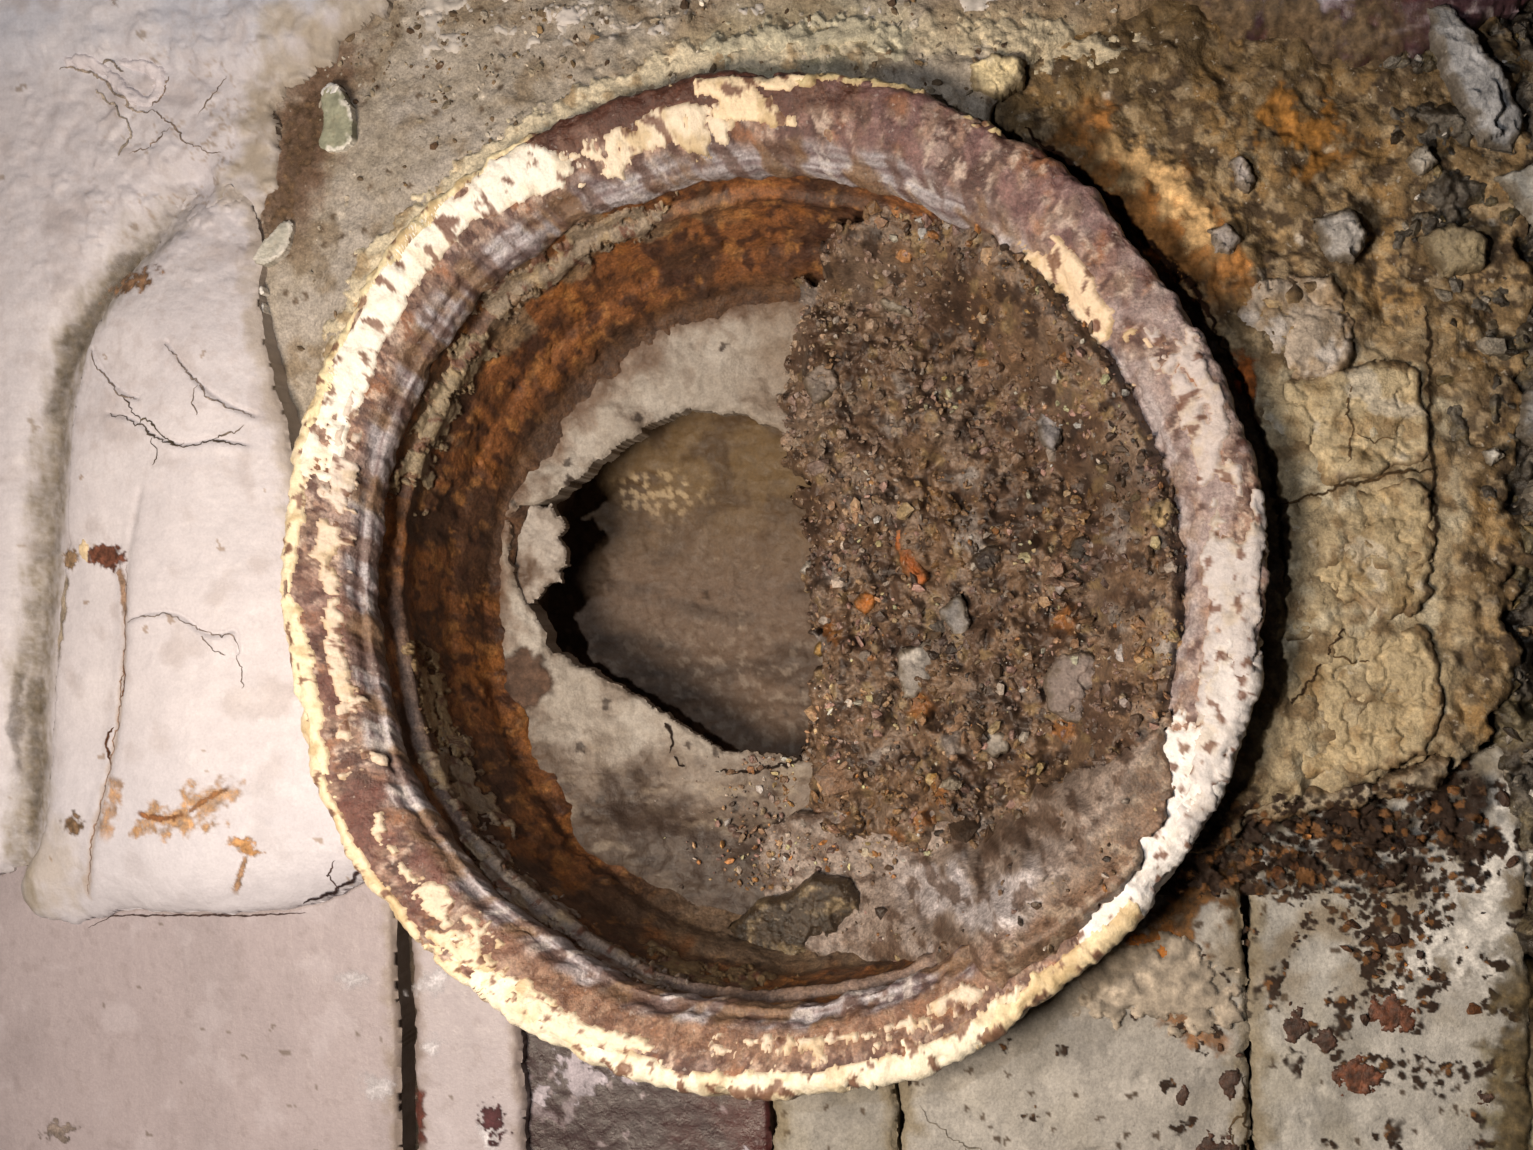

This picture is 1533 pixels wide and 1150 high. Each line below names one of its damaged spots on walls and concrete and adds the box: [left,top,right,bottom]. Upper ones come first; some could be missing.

crack [132,78,226,153]
corrosion [1254,78,1351,180]
corrosion [1055,103,1251,299]
crack [91,344,252,464]
corrosion [1228,349,1257,407]
corrosion [57,539,127,655]
peeling [279,72,1270,1101]
corrosion [504,647,553,709]
crack [87,569,360,928]
corrosion [100,778,122,833]
corrosion [132,781,239,839]
corrosion [229,837,260,891]